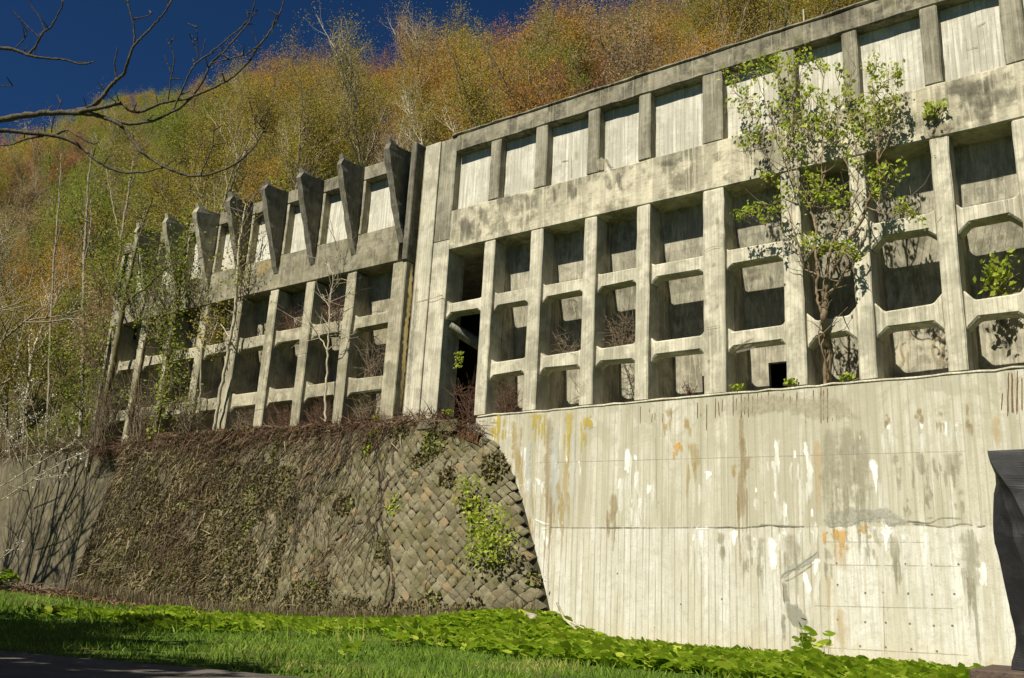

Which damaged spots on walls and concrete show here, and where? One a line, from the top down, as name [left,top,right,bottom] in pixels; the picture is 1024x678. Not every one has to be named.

water stain [490,413,593,578]
water stain [729,440,821,643]
rust [823,525,871,553]
water stain [859,424,933,597]